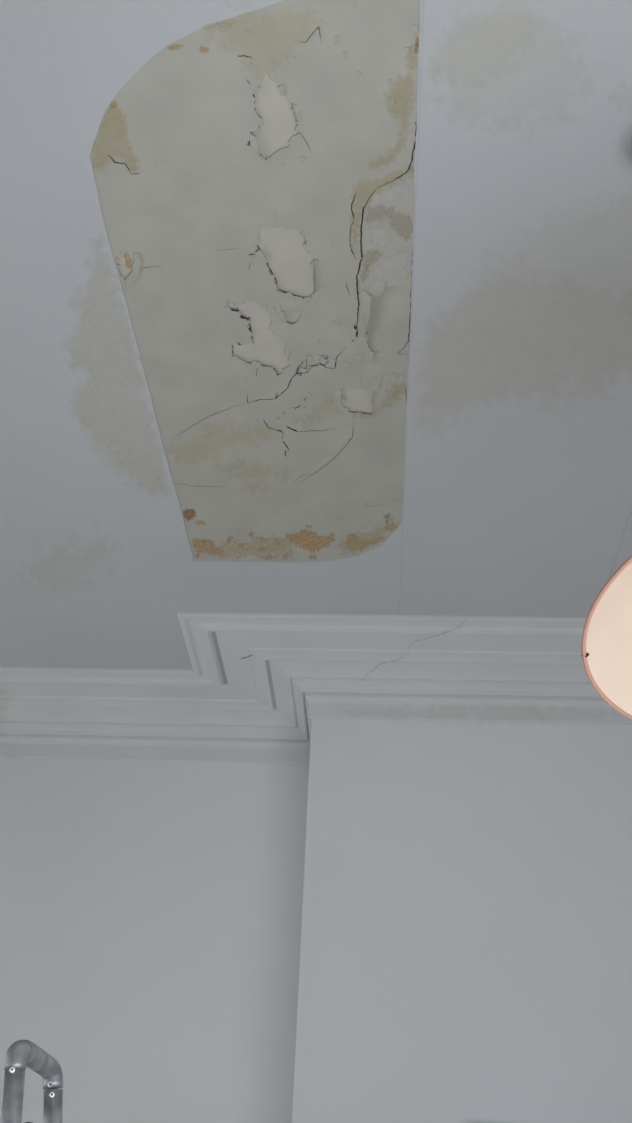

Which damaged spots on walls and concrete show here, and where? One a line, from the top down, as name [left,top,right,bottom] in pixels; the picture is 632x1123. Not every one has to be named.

peeling [90,0,420,562]
crack [177,122,417,481]